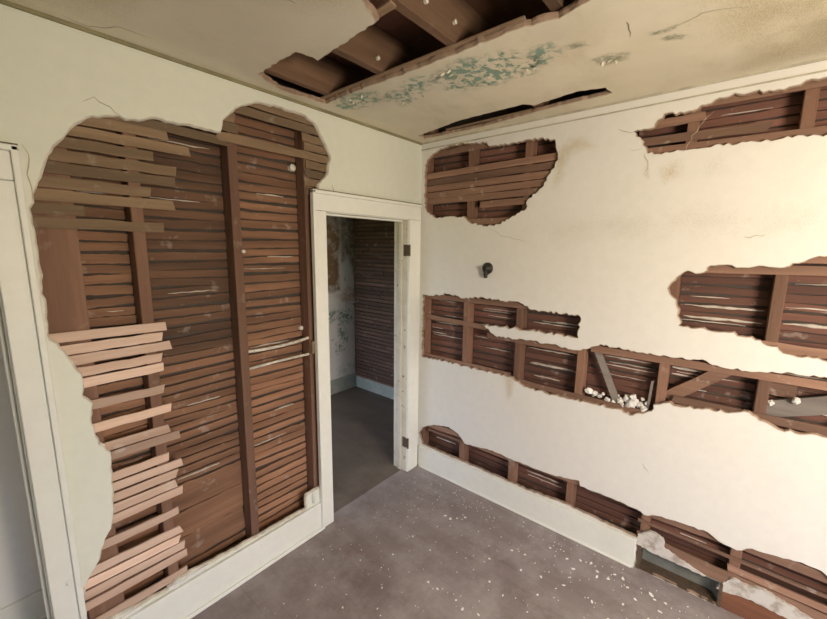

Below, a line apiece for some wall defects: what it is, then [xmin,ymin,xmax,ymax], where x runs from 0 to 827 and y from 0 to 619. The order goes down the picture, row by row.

flaking render [259,0,590,110]
peeling [589,52,631,67]
peeling [651,24,684,42]
flaking render [419,88,612,139]
flaking render [633,76,827,155]
flaking render [424,137,558,227]
flaking render [28,101,331,619]
flaking render [421,293,827,439]
flaking render [668,256,827,362]
flaking render [419,425,827,619]